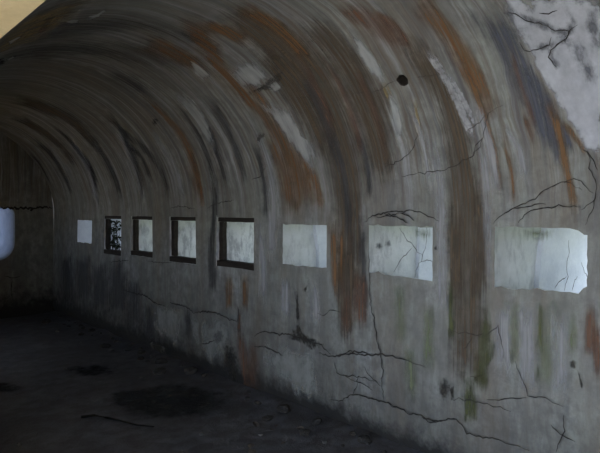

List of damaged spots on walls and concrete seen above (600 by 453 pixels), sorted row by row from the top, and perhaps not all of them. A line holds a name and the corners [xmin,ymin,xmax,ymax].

corrosion [144,22,322,208]
corrosion [331,230,343,292]
crack [385,106,501,177]
corrosion [423,0,514,196]
damp [411,46,550,384]
crack [507,10,577,67]
crack [493,147,597,225]
flaking render [507,0,600,150]
crack [254,259,529,451]
damp [465,386,476,421]
crack [450,326,575,452]
corrosion [585,312,599,373]